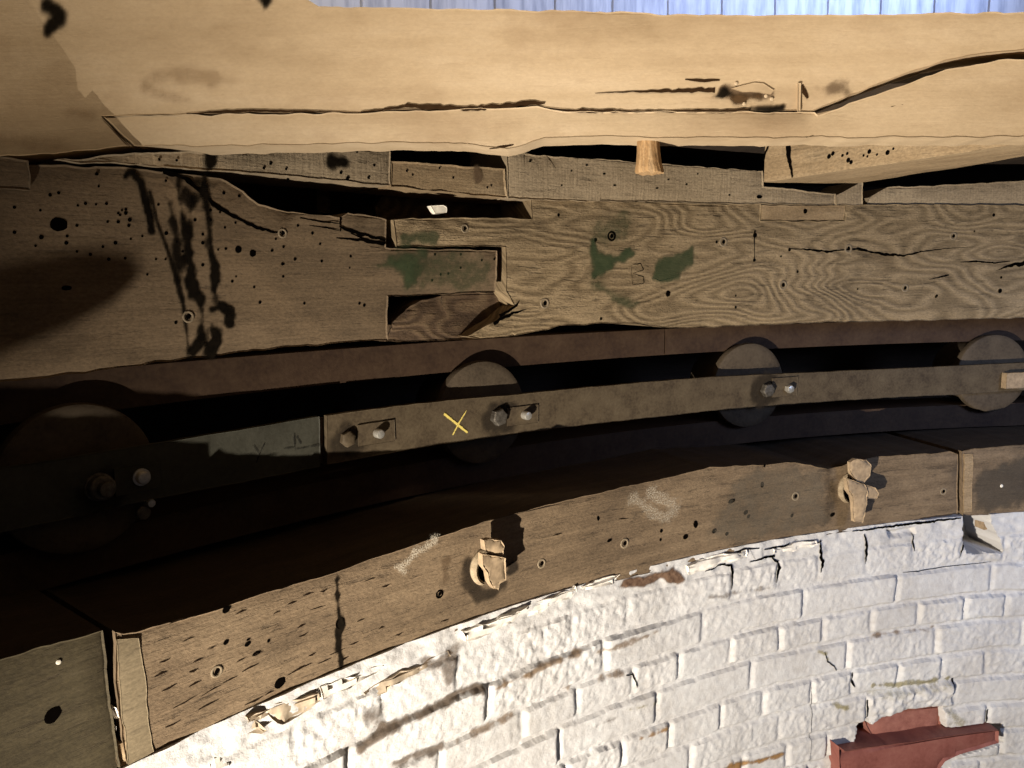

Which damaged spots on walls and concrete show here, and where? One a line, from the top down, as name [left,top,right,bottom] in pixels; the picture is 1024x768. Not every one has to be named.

crack [163,169,386,249]
crack [791,247,1024,280]
peeling [620,568,685,588]
crack [705,540,824,590]
crack [853,518,986,573]
peeling [422,646,457,685]
spalling [859,706,941,734]